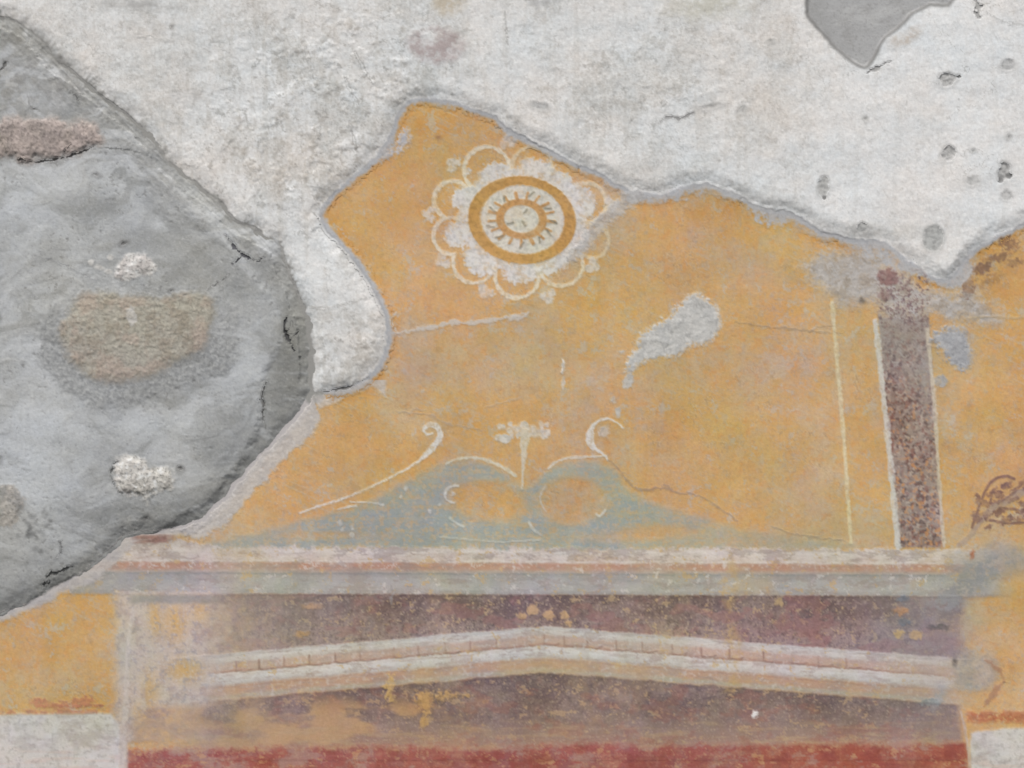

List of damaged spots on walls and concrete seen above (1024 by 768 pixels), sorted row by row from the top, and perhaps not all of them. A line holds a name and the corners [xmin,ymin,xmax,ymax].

spalling [935,68,962,90]
flaking render [0,109,109,169]
spalling [813,170,833,203]
spalling [959,156,1015,204]
crack [205,233,267,293]
spalling [920,221,947,255]
flaking render [55,250,221,389]
crack [281,296,368,354]
peeling [608,290,726,420]
peeling [924,323,978,389]
spalling [0,380,389,624]
crack [606,458,739,522]